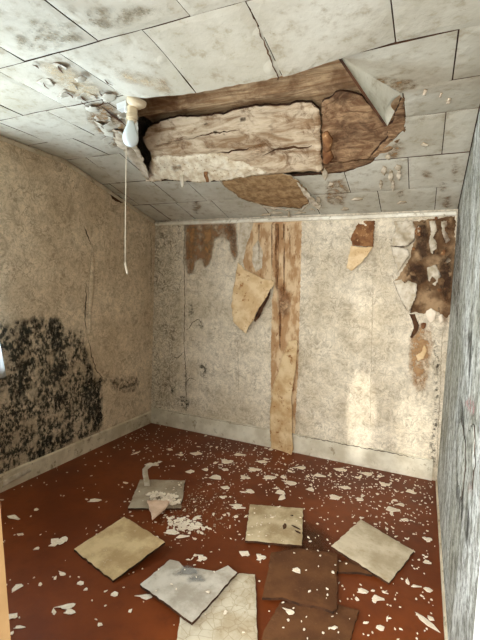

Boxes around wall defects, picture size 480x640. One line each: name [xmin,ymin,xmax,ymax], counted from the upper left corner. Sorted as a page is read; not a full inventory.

crack [249,7,279,80]
peeling [36,63,126,148]
spalling [391,216,456,329]
leakage [0,318,103,474]
crack [84,289,102,377]
leakage [410,327,440,399]